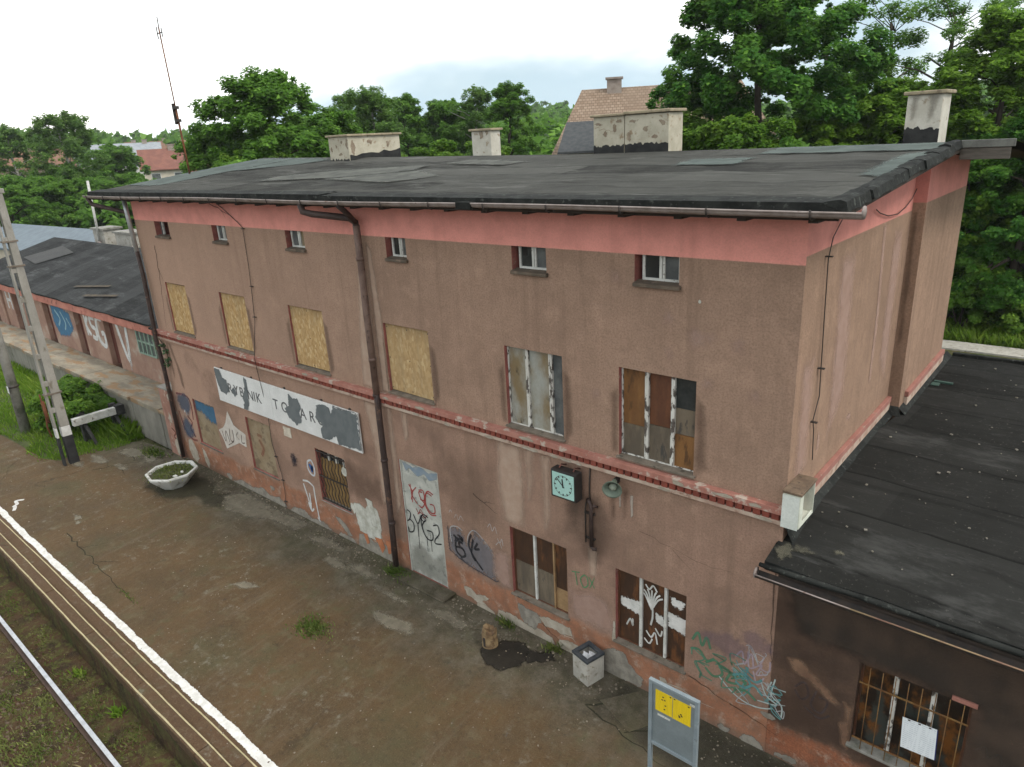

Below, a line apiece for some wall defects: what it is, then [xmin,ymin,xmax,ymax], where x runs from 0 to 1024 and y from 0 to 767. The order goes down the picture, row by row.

peeling [595,119,666,141]
crack [67,533,134,603]
spalling [224,473,407,603]
spalling [374,611,413,635]
peeling [464,586,578,670]